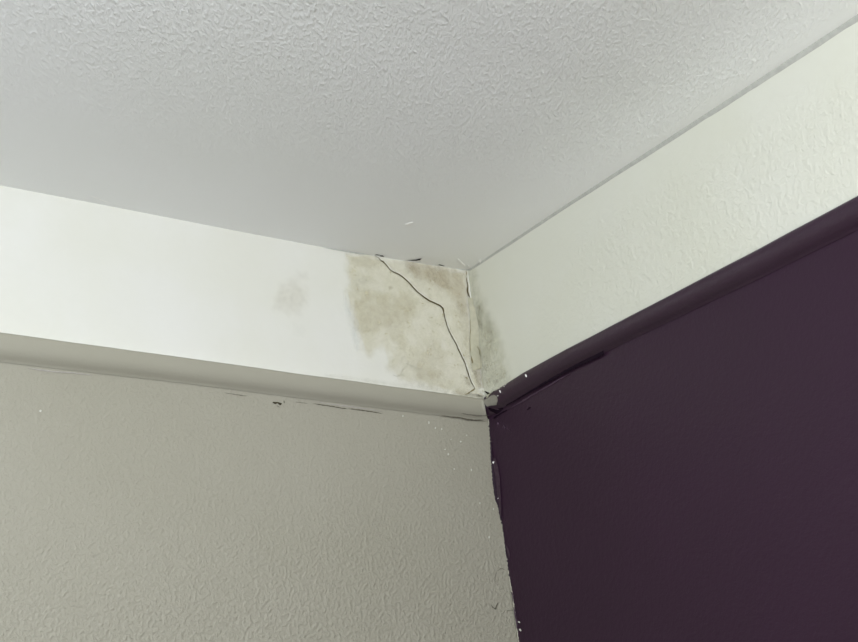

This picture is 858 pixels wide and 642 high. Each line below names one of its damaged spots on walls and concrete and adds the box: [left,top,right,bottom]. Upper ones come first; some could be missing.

crack [323,247,489,421]